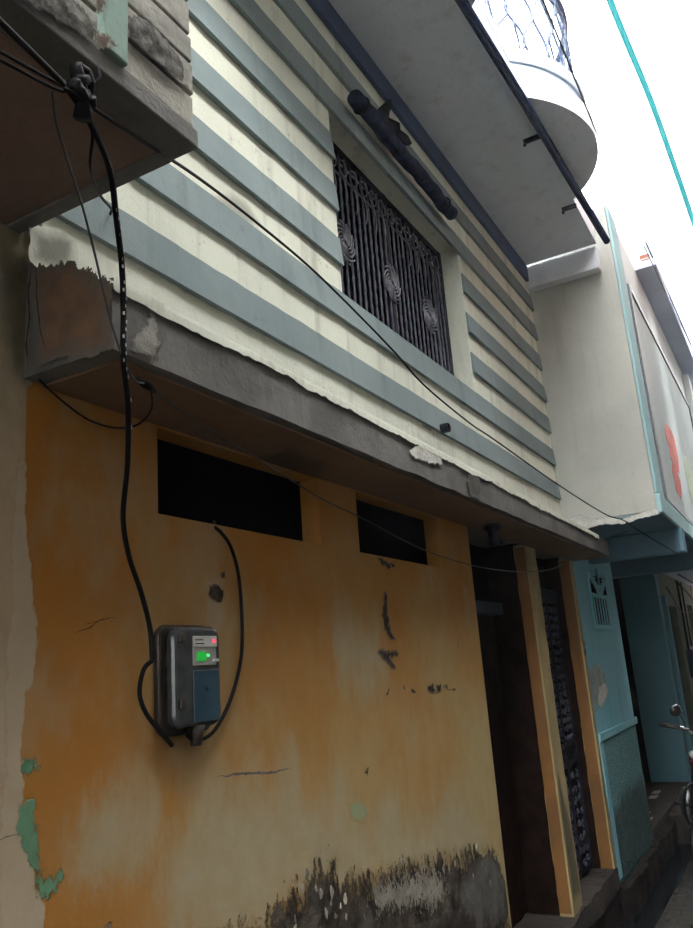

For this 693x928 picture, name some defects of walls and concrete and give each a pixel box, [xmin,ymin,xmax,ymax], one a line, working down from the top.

peeling [109,278,659,539]
spalling [377,592,398,670]
peeling [21,758,41,775]
peeling [16,798,64,900]
water stain [265,837,511,928]